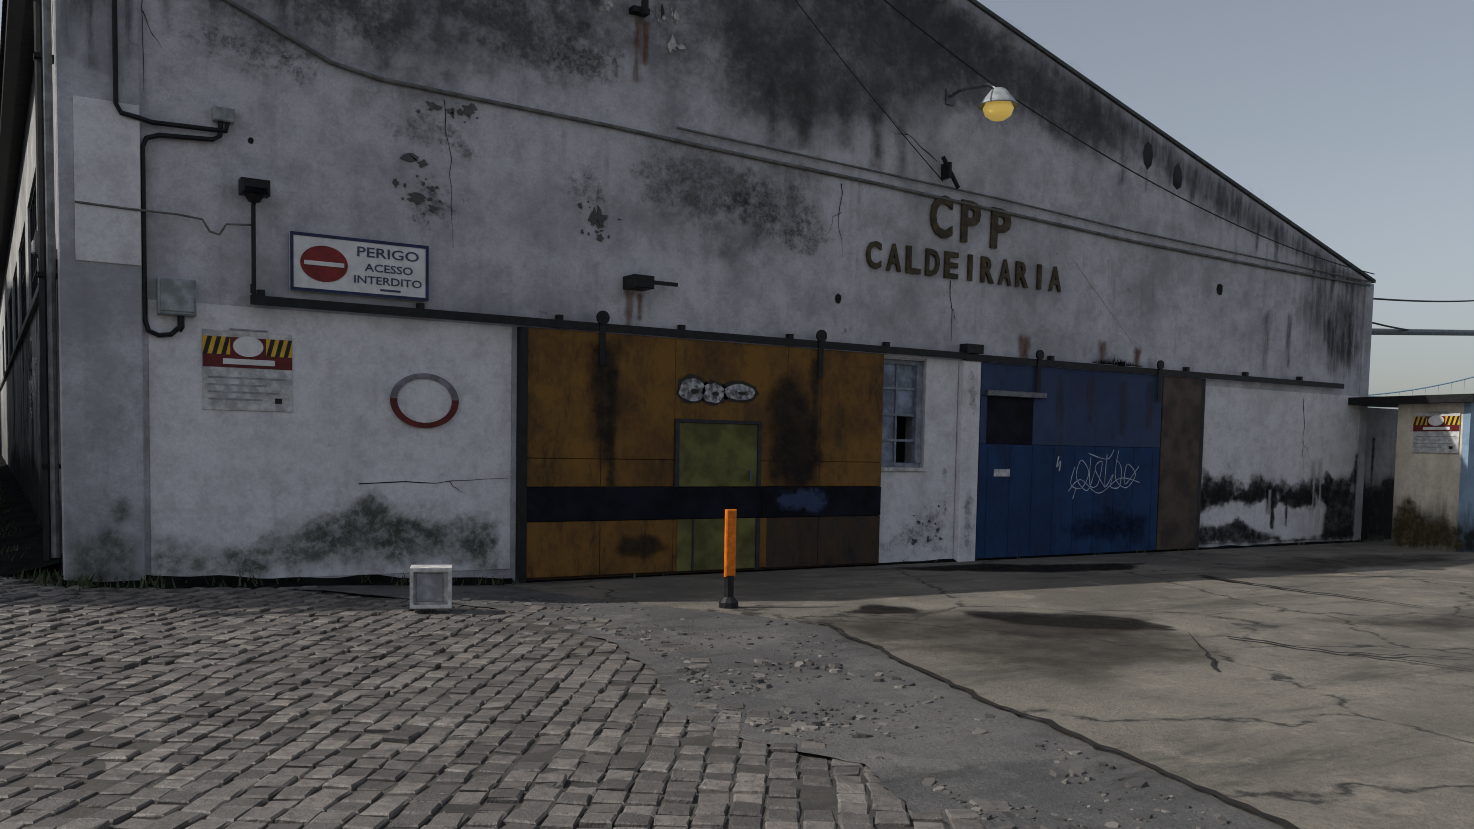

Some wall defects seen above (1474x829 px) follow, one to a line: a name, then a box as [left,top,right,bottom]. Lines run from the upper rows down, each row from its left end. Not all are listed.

spalling [417,101,479,123]
spalling [392,153,442,213]
damp [1090,93,1358,361]
damp [10,308,43,528]
mould [225,506,443,573]
damp [1199,438,1474,571]